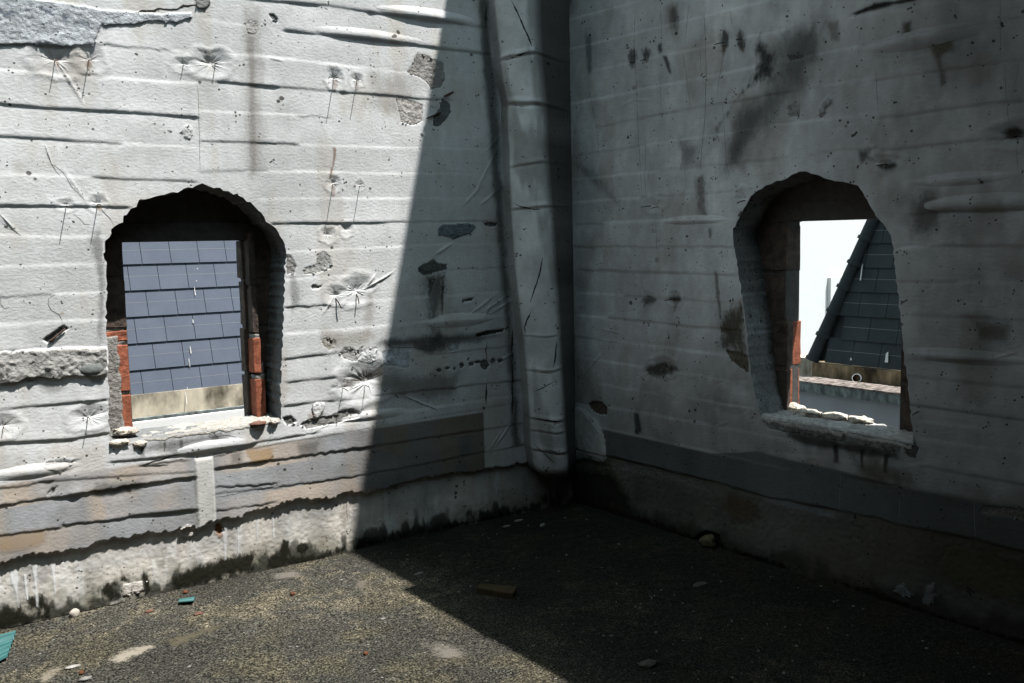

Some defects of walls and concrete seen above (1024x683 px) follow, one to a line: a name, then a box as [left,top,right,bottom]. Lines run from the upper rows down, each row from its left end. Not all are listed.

peeling [0,0,210,48]
crack [504,0,533,61]
leakage [721,31,744,48]
spalling [396,54,451,126]
leakage [727,31,816,161]
spalling [0,326,108,384]
spalling [726,349,749,372]
leakage [10,565,38,603]
leakage [142,572,151,595]